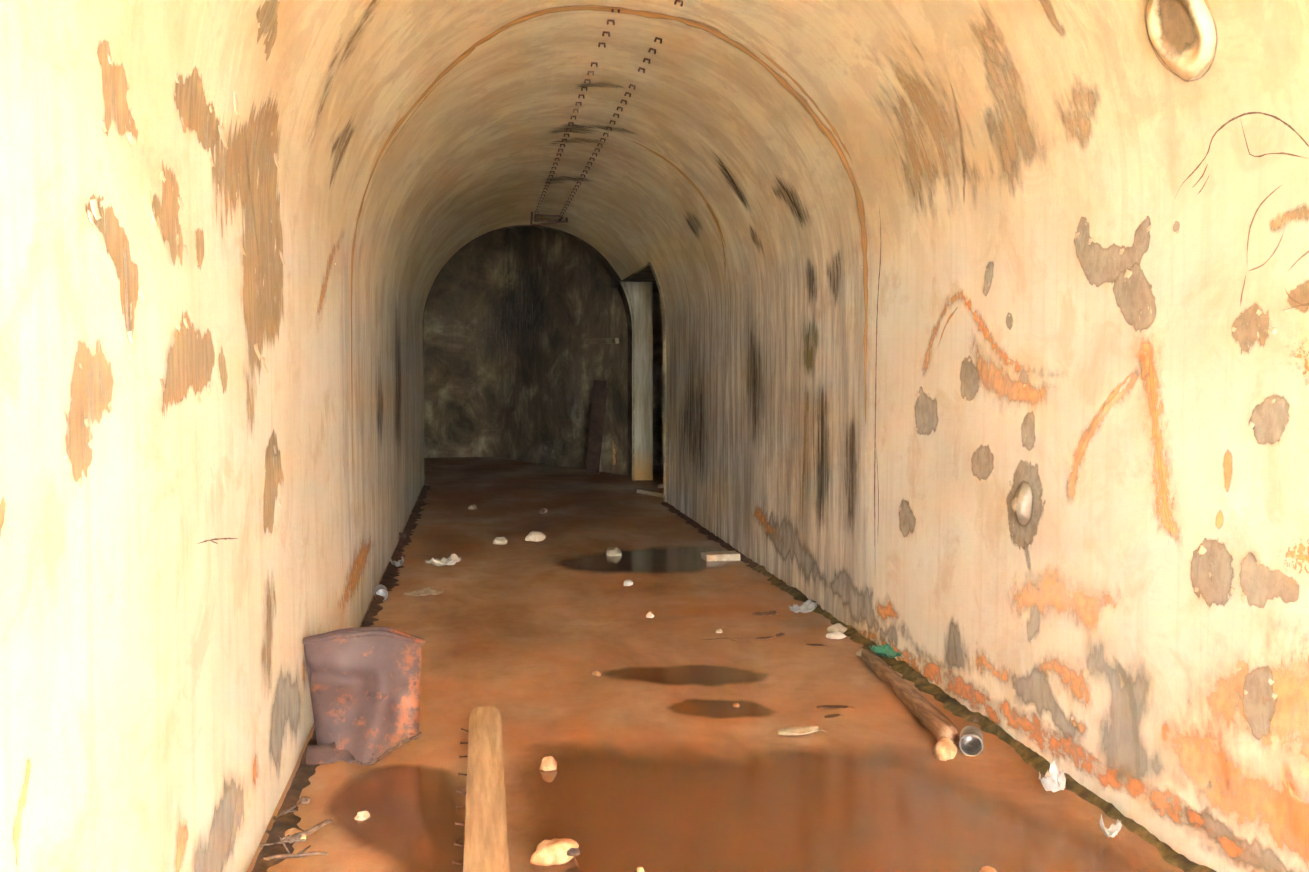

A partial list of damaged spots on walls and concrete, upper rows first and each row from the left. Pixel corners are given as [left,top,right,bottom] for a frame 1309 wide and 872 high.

peeling [97,41,138,144]
crack [1175,112,1309,198]
peeling [150,164,204,269]
peeling [174,66,285,377]
crack [1240,186,1309,310]
peeling [64,341,113,486]
peeling [158,312,228,416]
corrosion [924,293,1045,401]
corrosion [1068,341,1177,537]
corrosion [878,602,897,619]
corrosion [1286,543,1309,572]
corrosion [863,632,1247,858]